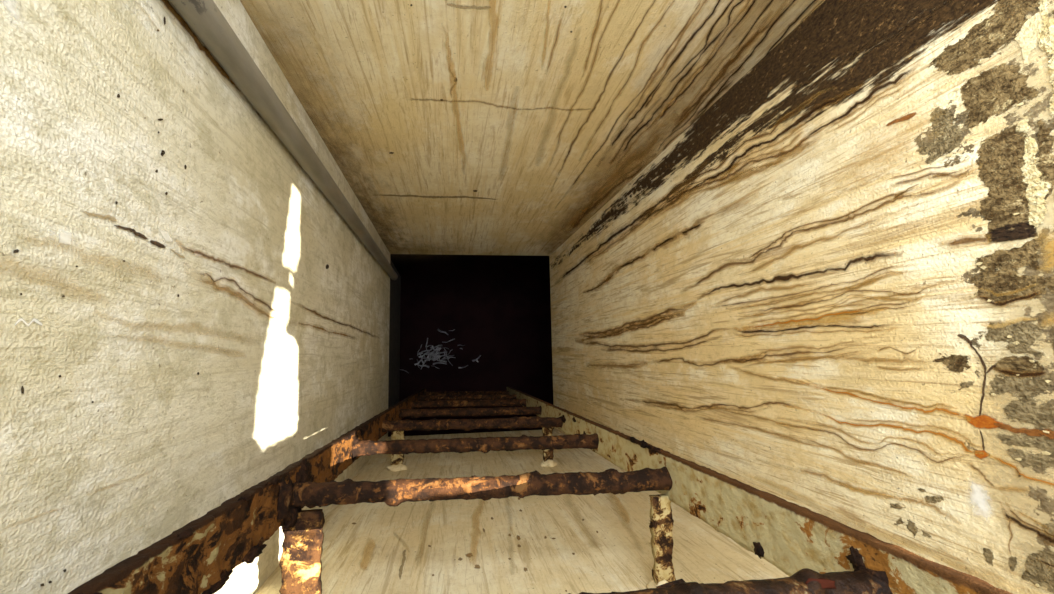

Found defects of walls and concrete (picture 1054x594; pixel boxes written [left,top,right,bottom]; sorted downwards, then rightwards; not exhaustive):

leakage [549,0,998,278]
crack [59,211,204,258]
spalling [914,0,1054,475]
corrosion [814,386,1054,491]
crack [958,334,996,450]
peeling [890,503,932,538]
peeling [919,488,944,504]
peeling [983,548,994,566]
spalling [1009,484,1054,593]